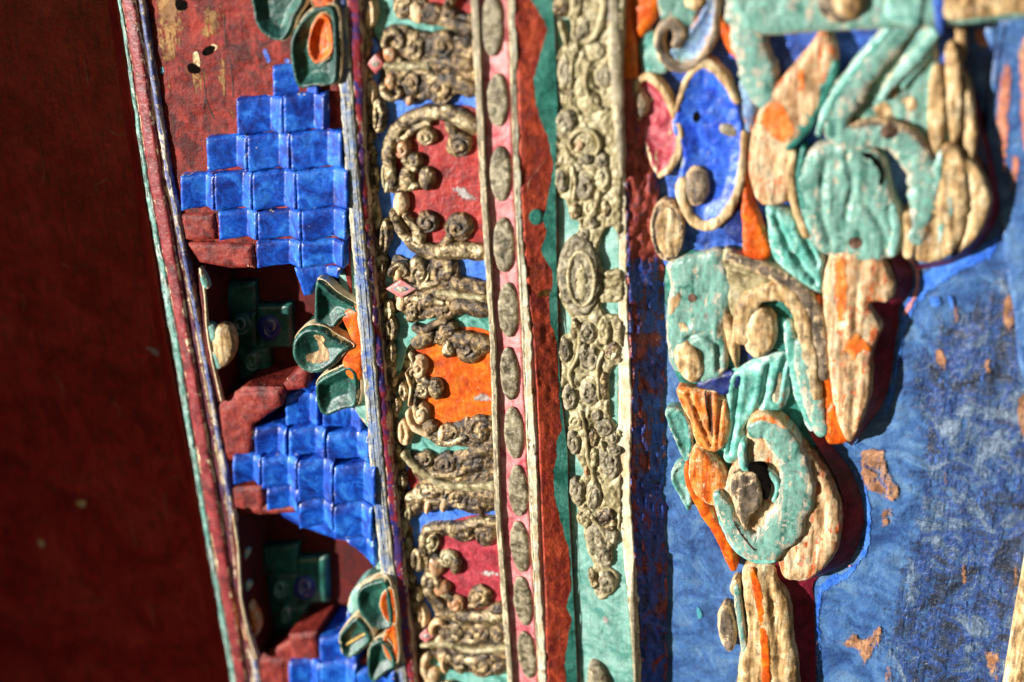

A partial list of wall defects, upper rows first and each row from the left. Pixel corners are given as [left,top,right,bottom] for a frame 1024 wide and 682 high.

peeling [151,0,187,88]
peeling [186,5,226,96]
peeling [758,102,794,143]
peeling [815,229,1024,682]